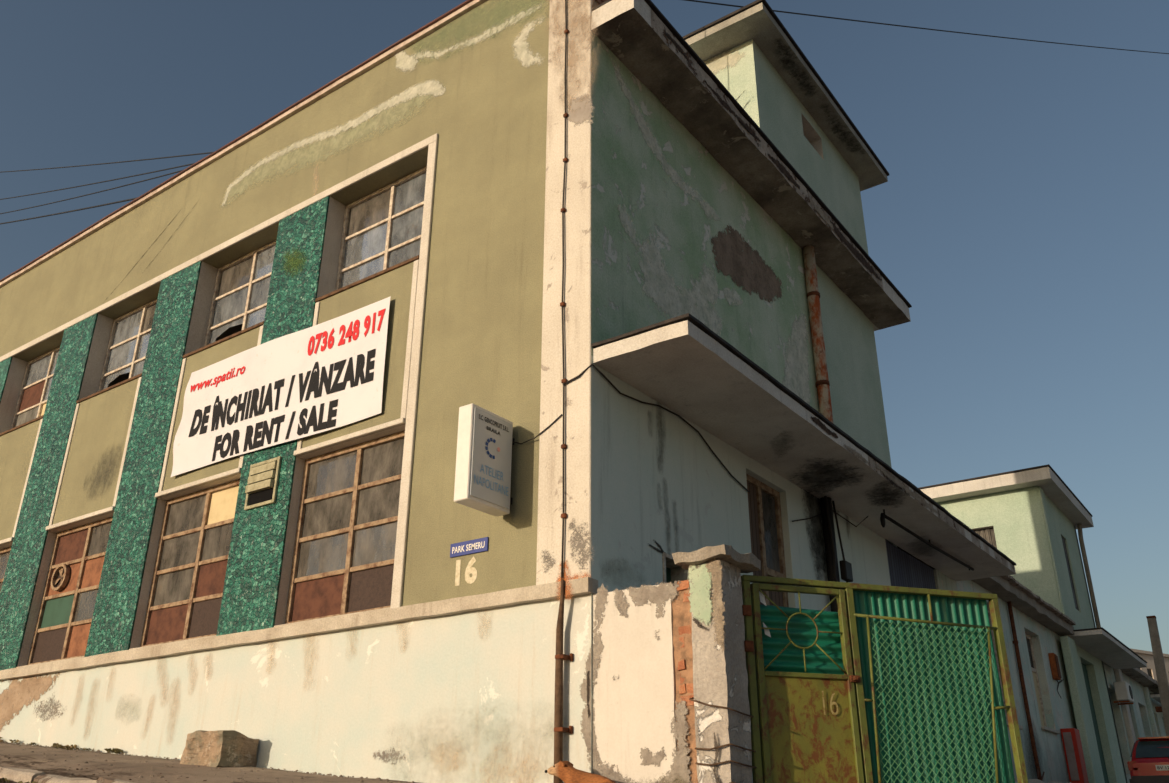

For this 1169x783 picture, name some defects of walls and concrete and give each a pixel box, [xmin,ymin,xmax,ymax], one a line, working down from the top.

peeling [703,51,800,189]
peeling [618,204,782,336]
leakage [793,462,862,576]
flaking render [0,673,63,732]
spalling [580,559,726,783]